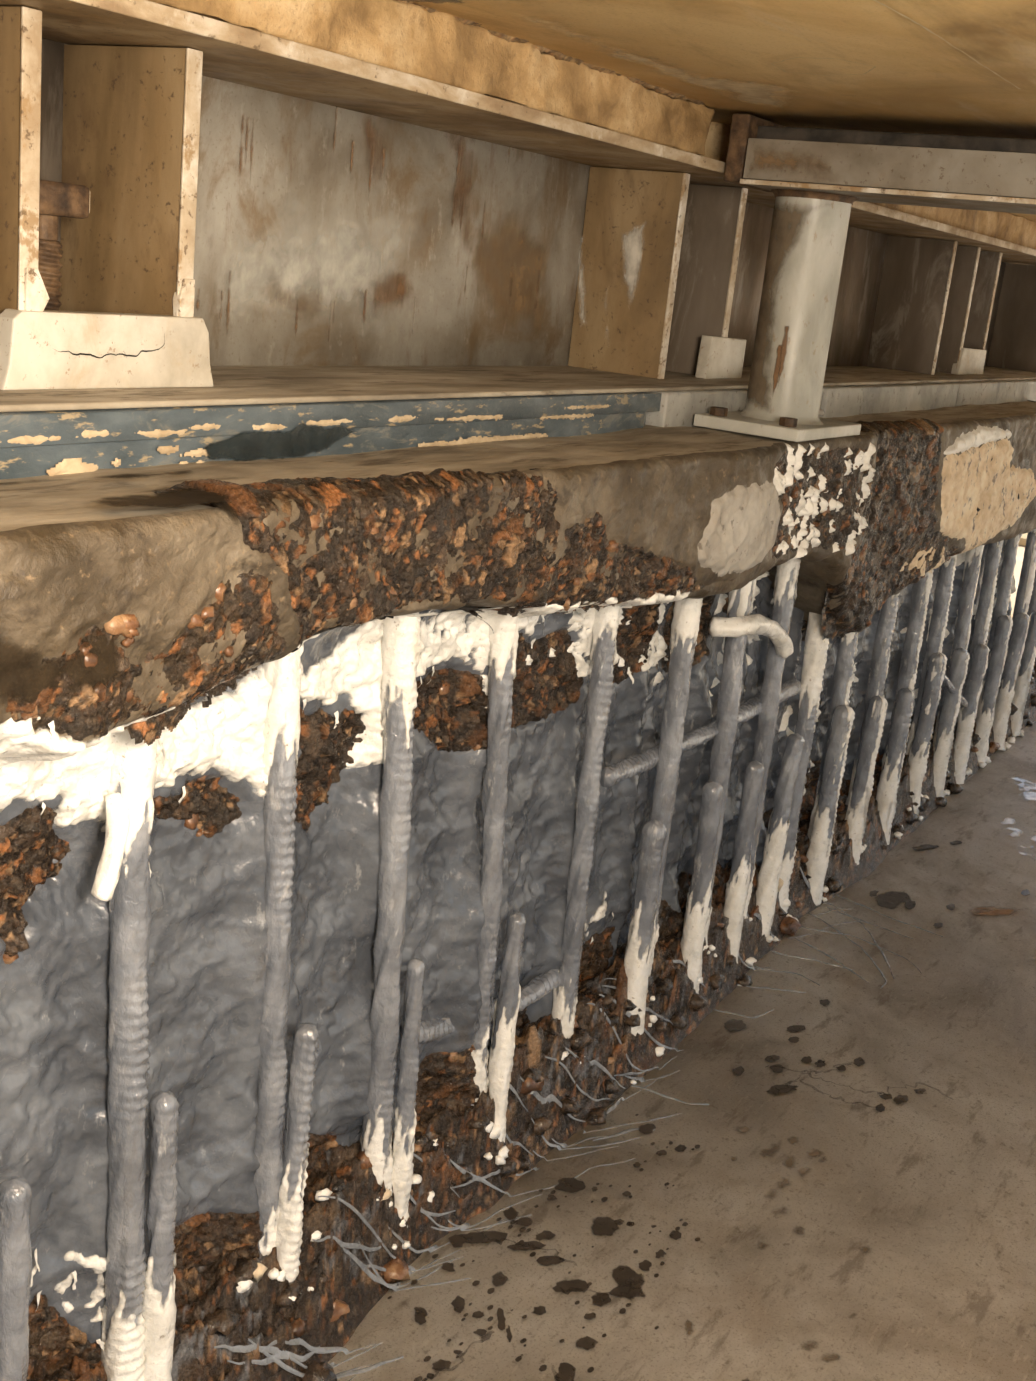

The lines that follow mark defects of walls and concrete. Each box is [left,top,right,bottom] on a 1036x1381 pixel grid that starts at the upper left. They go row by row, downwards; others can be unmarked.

rust [240,118,253,172]
crack [54,335,165,358]
rust [363,276,408,321]
rust [747,206,804,407]
spalling [772,418,1036,641]
spalling [0,423,734,752]
leakage [0,635,118,703]
spalling [153,775,242,838]
spalling [294,707,366,833]
spalling [0,803,71,964]
spalling [415,1044,480,1133]
spalling [172,1211,263,1296]